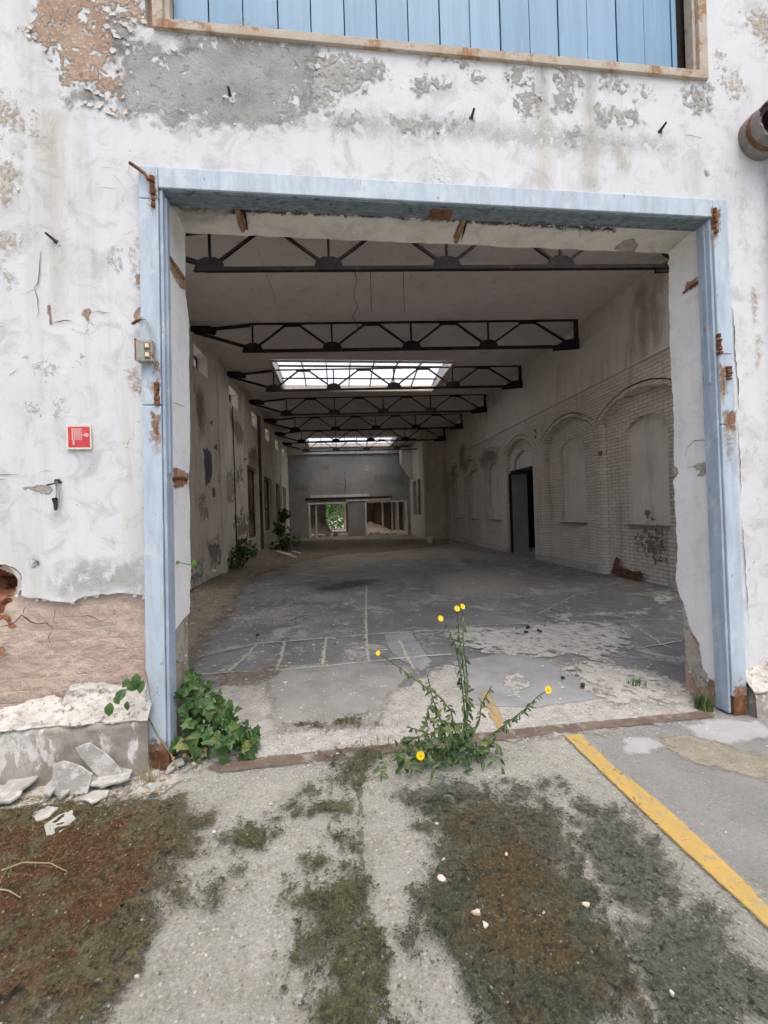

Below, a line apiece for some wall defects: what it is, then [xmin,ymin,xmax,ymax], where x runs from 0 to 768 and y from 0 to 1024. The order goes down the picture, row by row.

peeling [739,3,768,52]
flaking render [17,0,390,134]
peeling [389,111,468,139]
peeling [410,55,486,98]
peeling [502,66,585,122]
peeling [564,125,584,148]
peeling [594,71,655,130]
peeling [680,49,751,115]
rust [723,410,737,430]
damp [191,540,221,583]
crack [0,606,58,646]
flaking render [0,564,146,708]